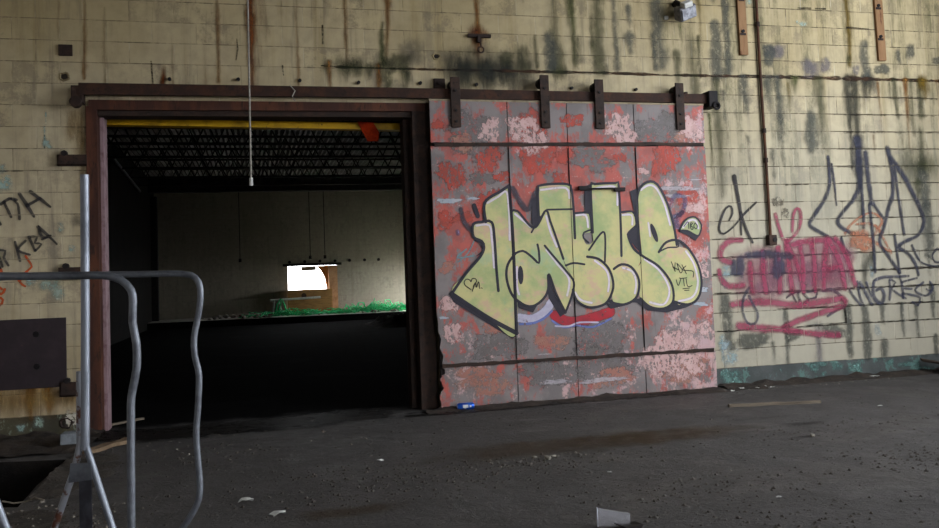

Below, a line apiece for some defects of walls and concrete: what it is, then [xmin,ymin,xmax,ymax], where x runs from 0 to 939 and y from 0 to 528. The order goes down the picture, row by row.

water stain [342,31,410,87]
rust [470,0,483,52]
water stain [445,33,562,85]
water stain [568,0,578,62]
water stain [593,0,634,72]
water stain [708,0,747,148]
water stain [763,45,784,127]
water stain [794,59,830,152]
water stain [844,41,896,177]